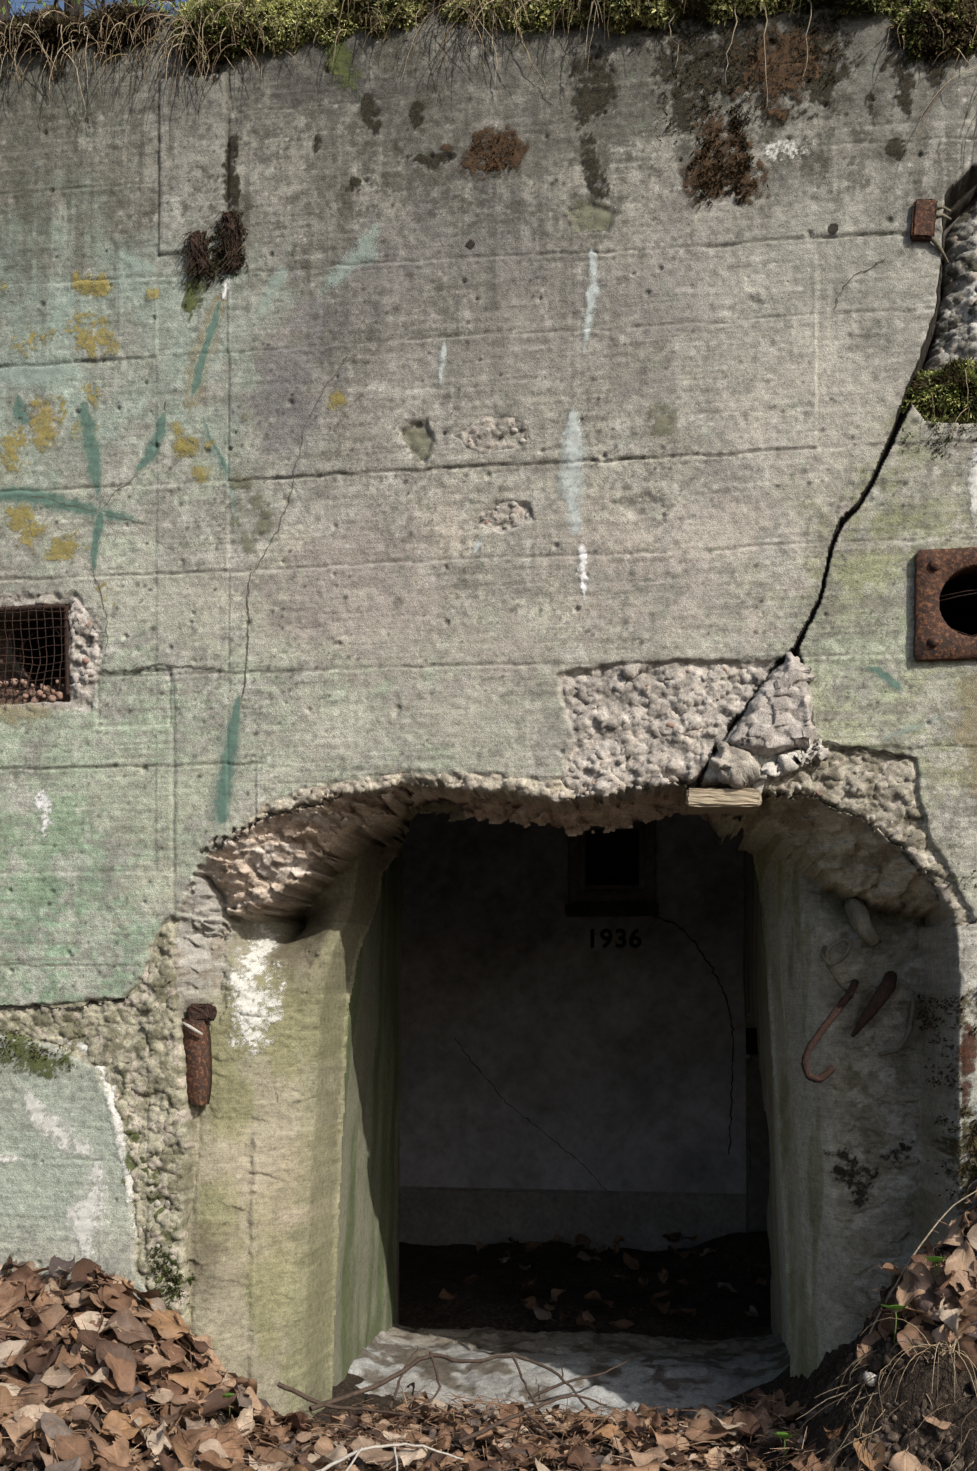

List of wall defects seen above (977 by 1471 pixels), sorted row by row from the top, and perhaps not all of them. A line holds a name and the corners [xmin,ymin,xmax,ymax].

damp [40,48,76,85]
damp [221,134,242,212]
damp [629,8,864,209]
damp [885,137,907,160]
damp [881,28,948,118]
damp [584,249,599,344]
spalling [921,200,977,374]
damp [557,411,589,600]
crack [695,165,977,788]
spalling [227,661,778,841]
spalling [751,742,973,928]
spalling [0,917,197,1326]